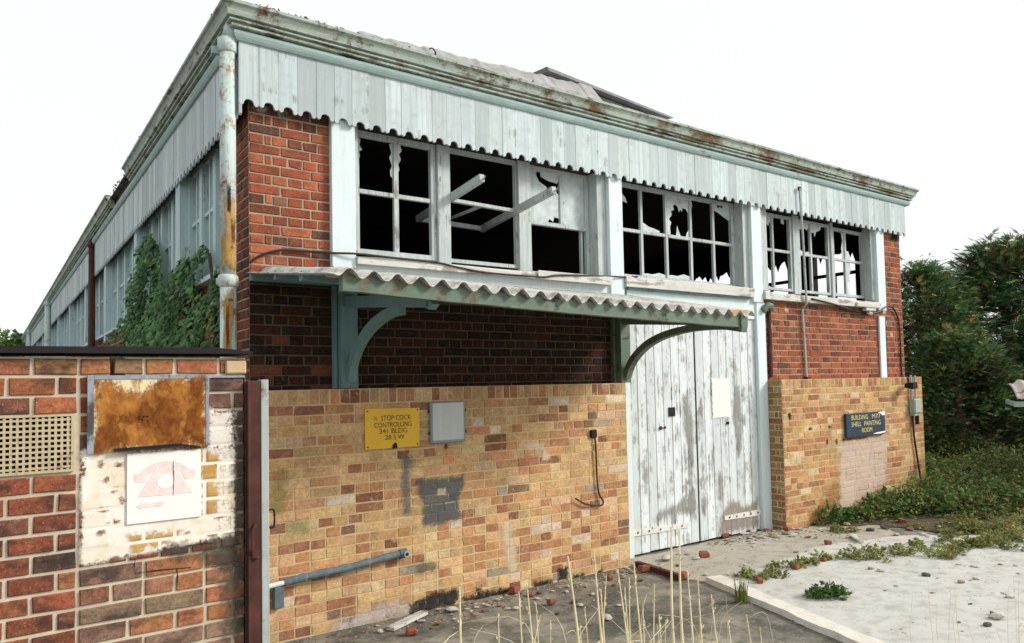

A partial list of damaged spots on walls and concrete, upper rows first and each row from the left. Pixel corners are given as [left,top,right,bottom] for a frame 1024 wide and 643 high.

rust [220,185,236,270]
rust [223,289,234,358]
rust [94,376,206,455]
peeling [80,408,236,565]
damp [401,455,411,513]
peeling [652,373,758,538]